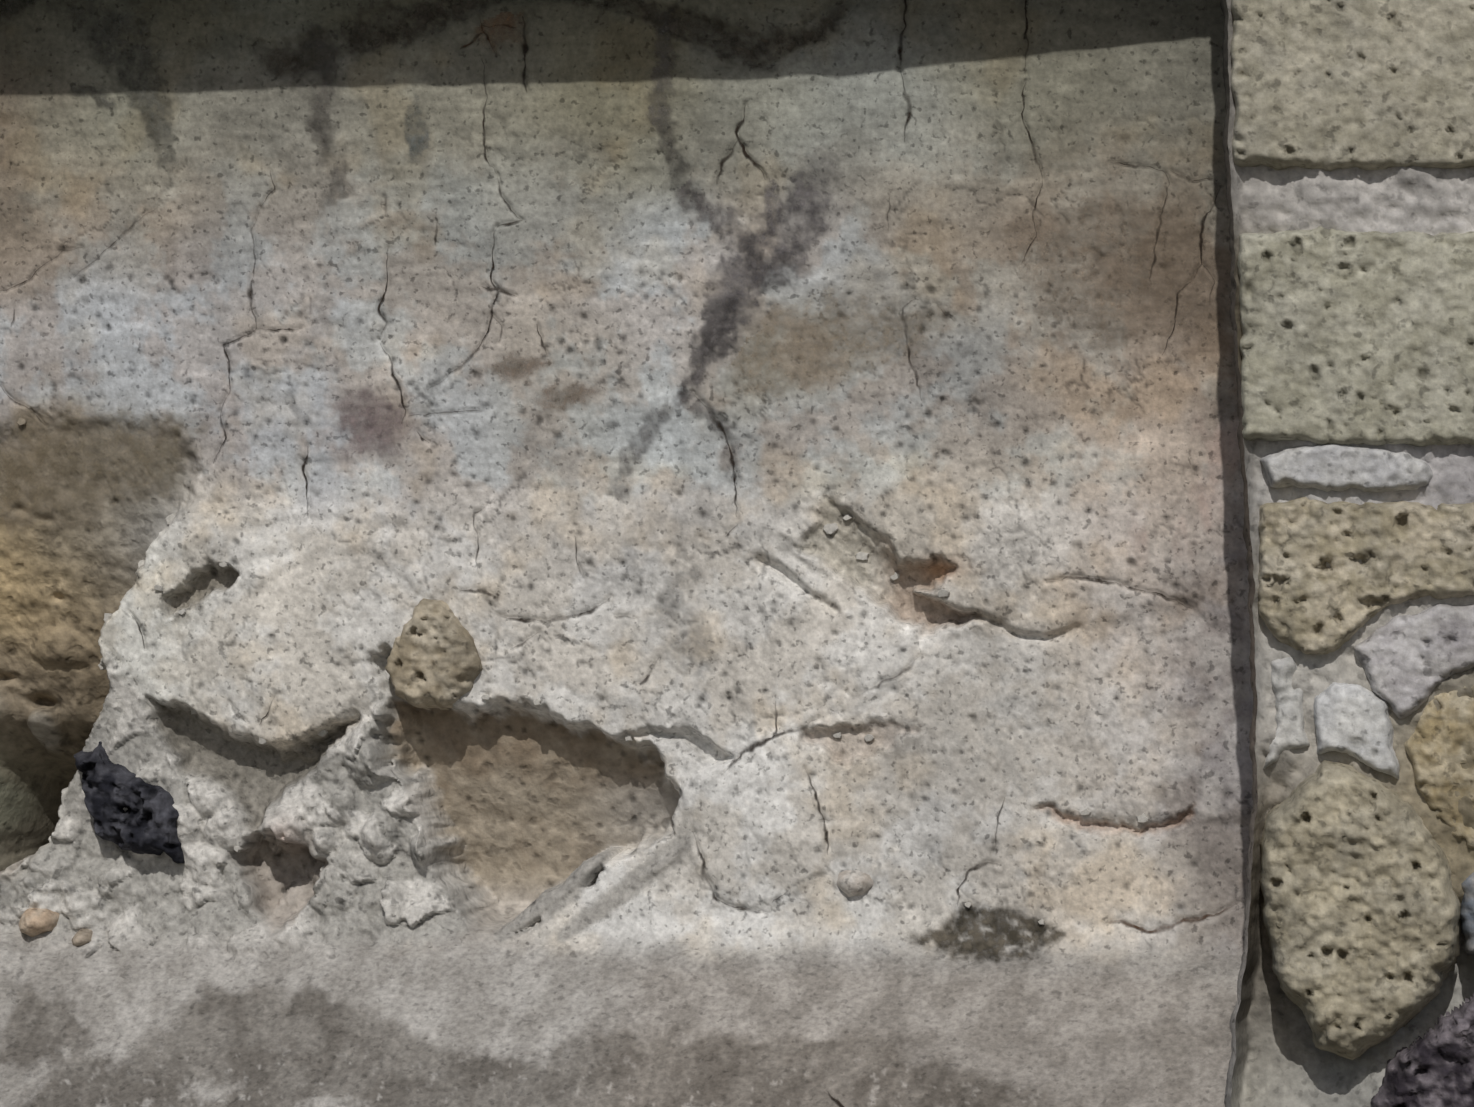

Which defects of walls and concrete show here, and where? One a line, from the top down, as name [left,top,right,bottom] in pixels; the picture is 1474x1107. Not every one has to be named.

crack [449,19,528,374]
crack [719,107,763,175]
crack [219,239,294,451]
crack [378,255,476,441]
water stain [678,174,828,413]
crack [301,454,309,498]
crack [713,417,737,535]
spalling [789,486,988,641]
spalling [140,692,683,942]
spalling [794,713,927,770]
spalling [1030,799,1199,842]
spalling [904,892,1063,964]